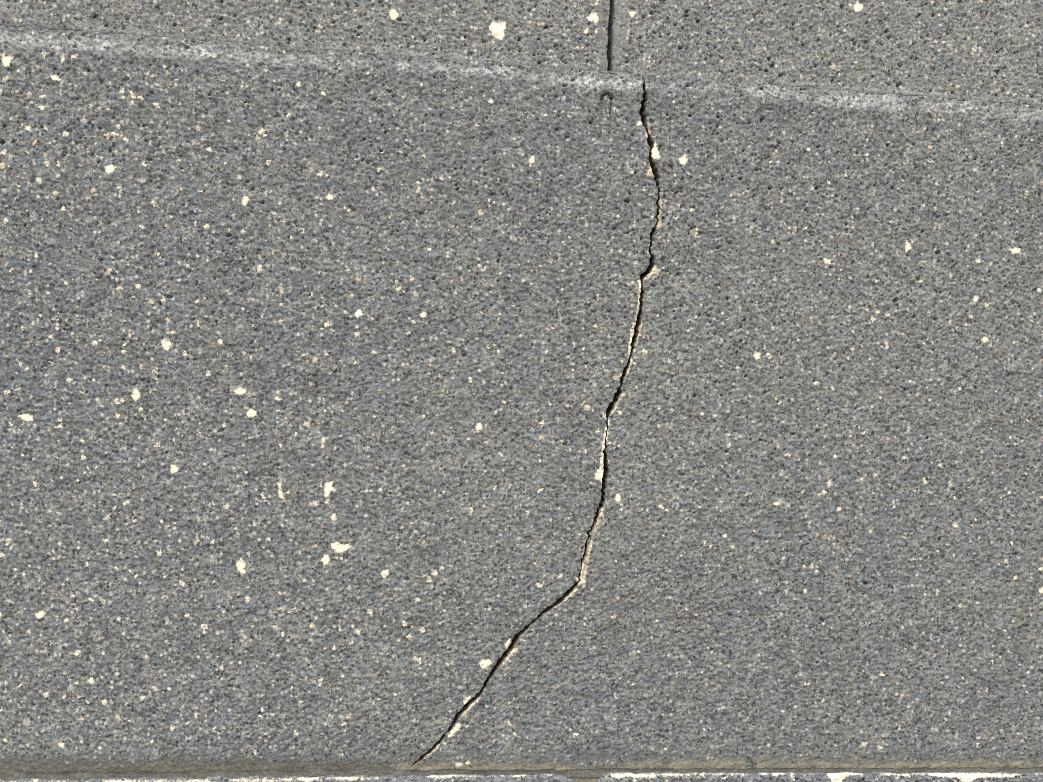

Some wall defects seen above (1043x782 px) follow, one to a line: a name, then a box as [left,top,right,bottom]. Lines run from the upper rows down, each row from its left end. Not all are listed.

crack [411,76,662,766]